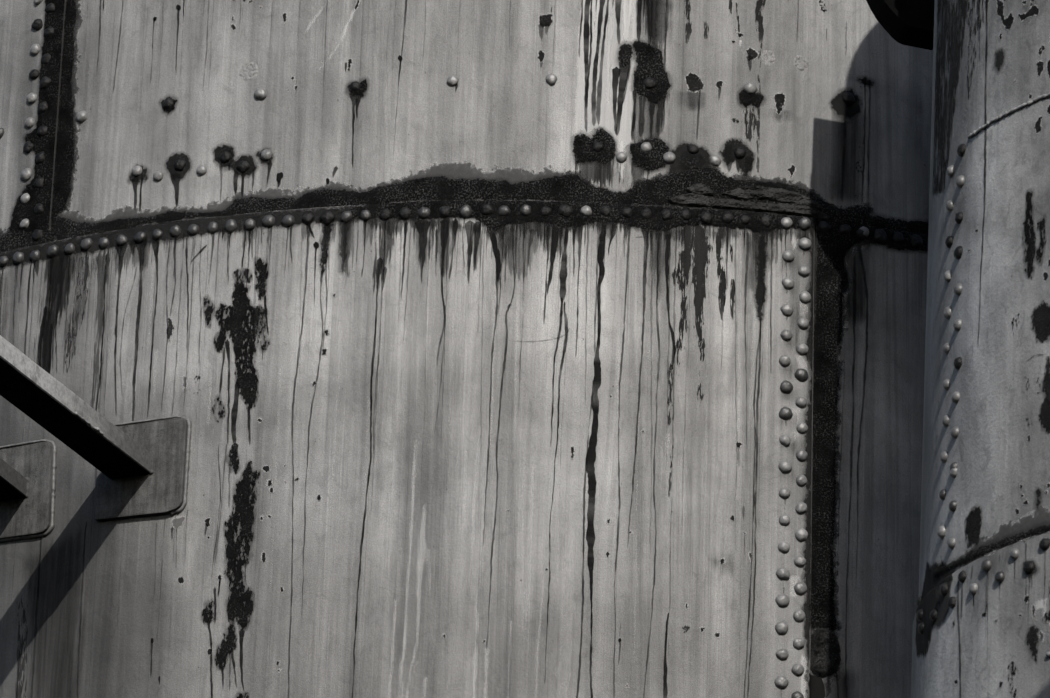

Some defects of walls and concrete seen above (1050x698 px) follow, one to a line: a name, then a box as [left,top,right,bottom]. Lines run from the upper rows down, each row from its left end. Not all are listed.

rust [539,7,553,28]
rust [347,79,368,167]
rust [580,0,631,120]
rust [685,73,724,116]
rust [732,89,764,141]
rust [774,93,785,114]
rust [487,272,515,502]
rust [551,378,560,481]
rust [560,321,568,370]
rust [630,258,647,509]
rust [1011,300,1050,343]
rust [1023,357,1050,441]